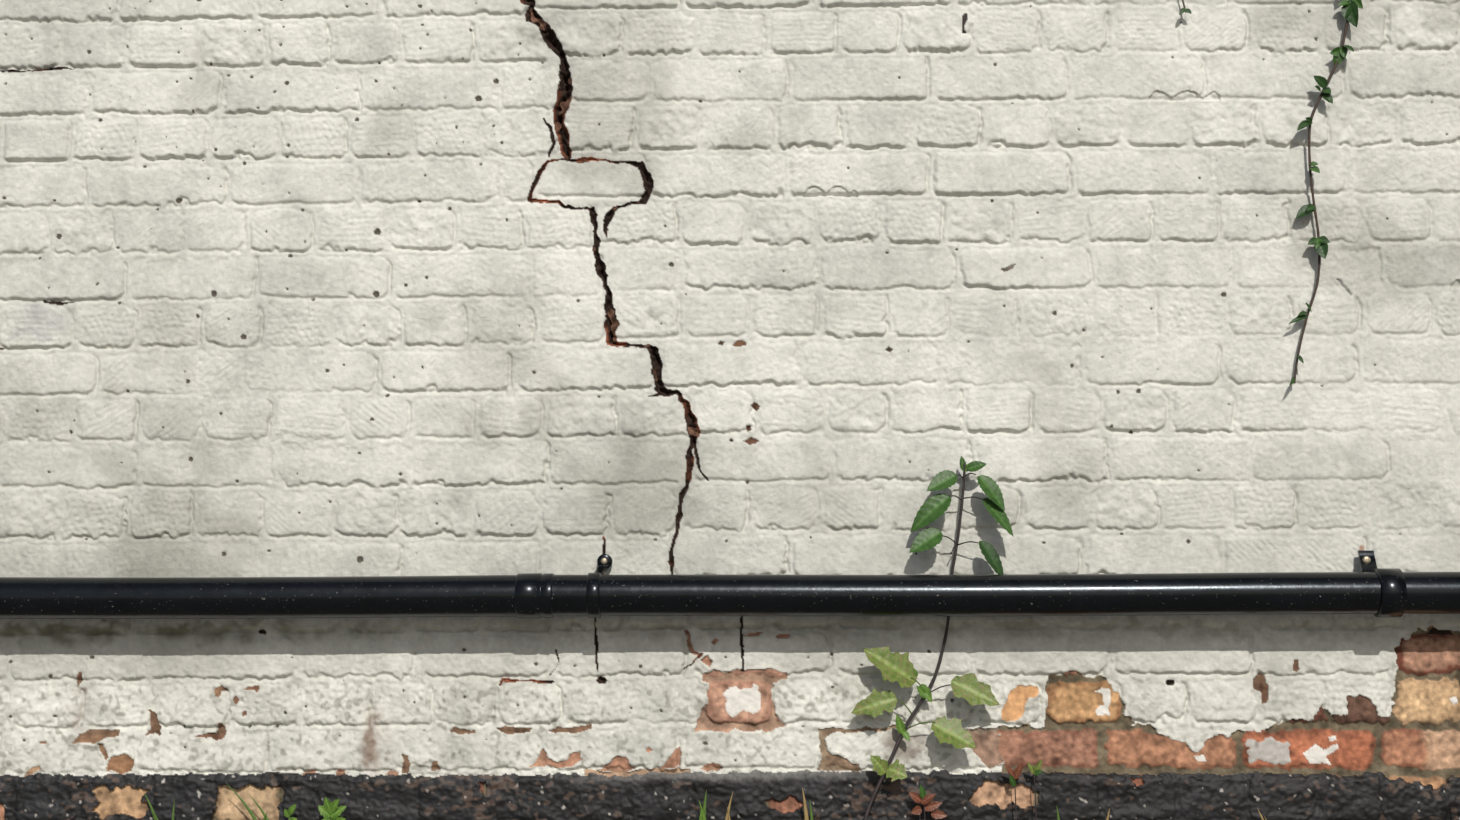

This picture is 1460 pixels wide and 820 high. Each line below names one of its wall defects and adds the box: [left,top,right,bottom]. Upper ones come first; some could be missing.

crack [520,0,709,575]
crack [498,649,560,686]
crack [592,618,600,671]
flaking render [73,729,150,820]
peeling [145,709,227,749]
peeling [214,685,260,728]
peeling [386,754,411,775]
peeling [450,723,737,776]
peeling [683,629,905,771]
peeling [964,625,1460,810]